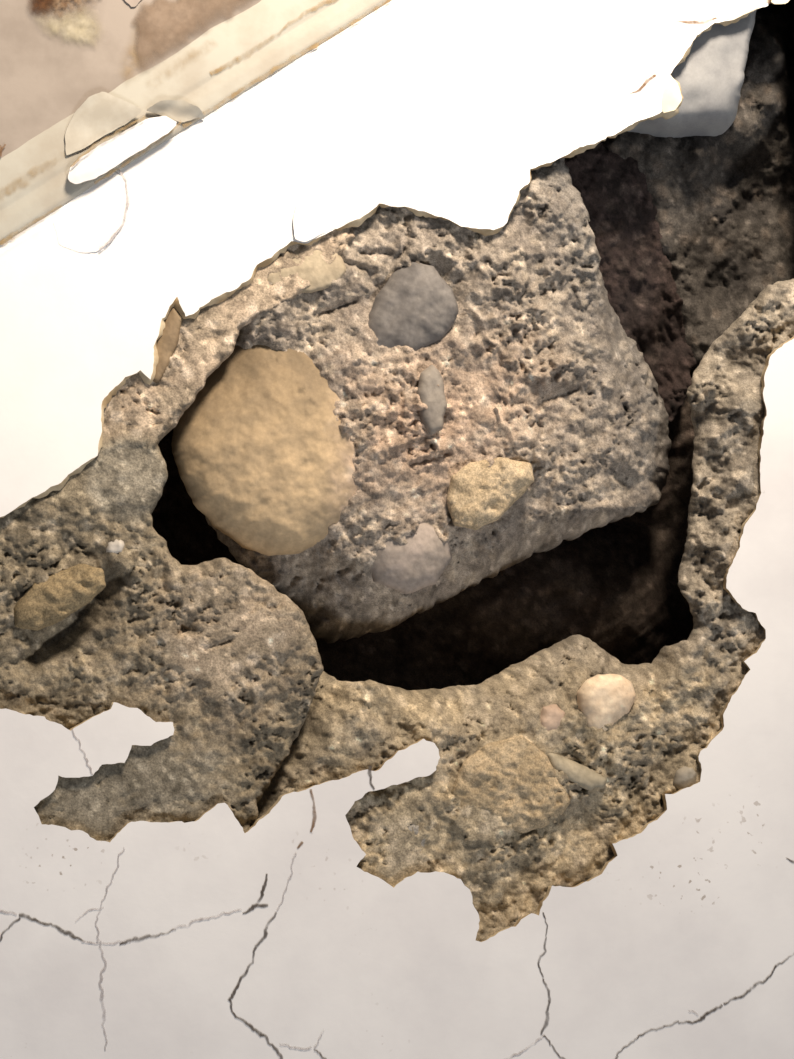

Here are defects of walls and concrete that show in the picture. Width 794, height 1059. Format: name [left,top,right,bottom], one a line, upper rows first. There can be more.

peeling [125,0,246,64]
peeling [53,92,205,253]
spalling [0,141,697,842]
spalling [253,0,794,942]
crack [72,729,93,775]
crack [367,766,375,790]
crack [0,789,326,1059]
crack [511,912,565,1059]
crack [616,961,785,1059]